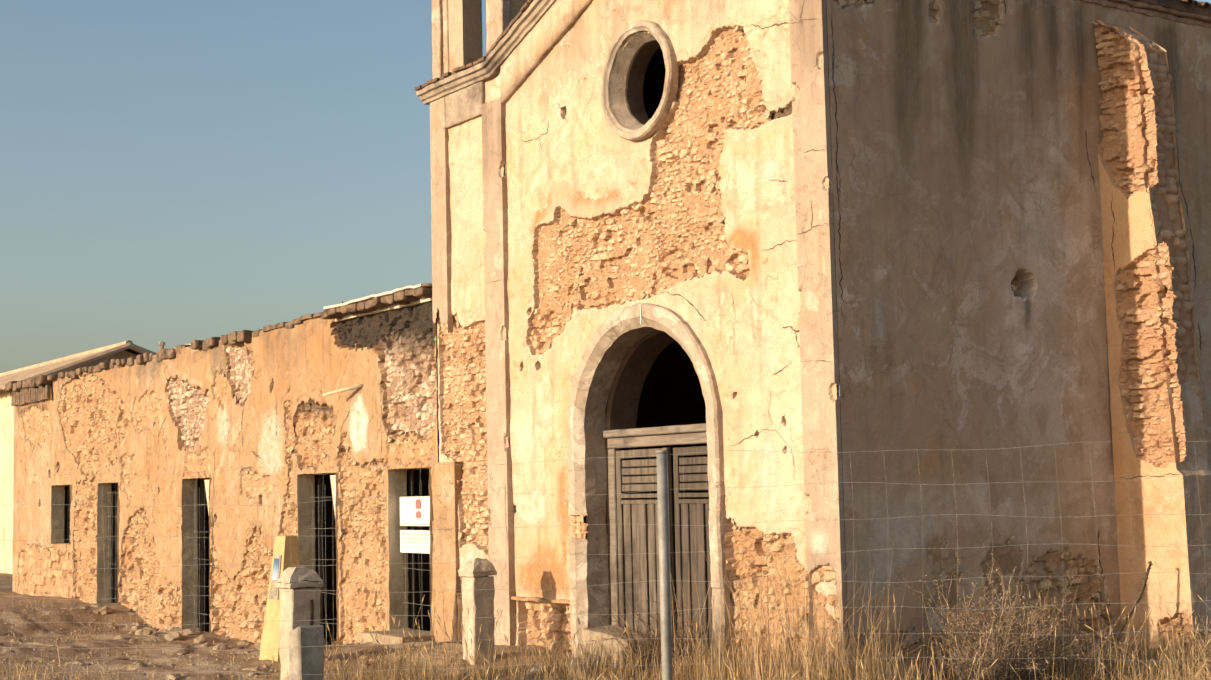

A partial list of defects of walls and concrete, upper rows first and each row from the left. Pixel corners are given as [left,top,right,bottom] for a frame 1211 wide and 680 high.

flaking render [972,0,1005,38]
flaking render [530,26,781,369]
flaking render [1094,20,1199,467]
flaking render [18,373,182,631]
flaking render [165,345,255,477]
flaking render [280,301,489,644]
crack [731,326,829,475]
flaking render [210,528,273,643]
flaking render [730,519,1121,680]